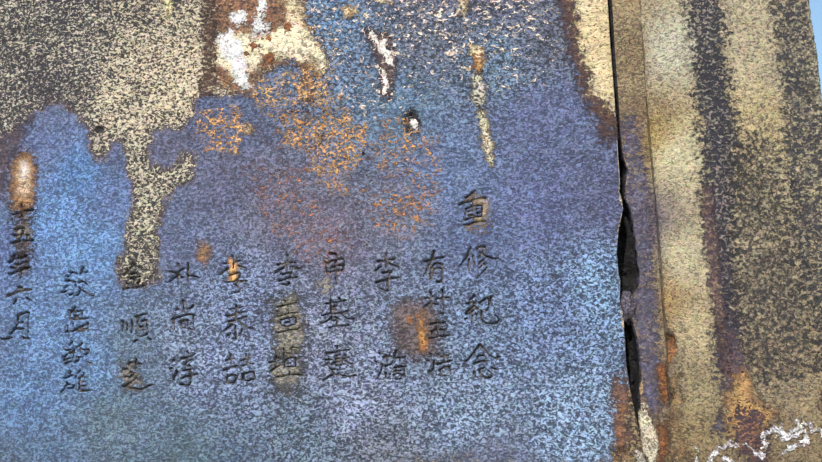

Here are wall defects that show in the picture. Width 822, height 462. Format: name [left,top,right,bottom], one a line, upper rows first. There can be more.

corrosion [0,115,35,201]
corrosion [188,0,442,265]
spalling [209,0,560,134]
corrosion [386,296,445,365]
crack [608,0,647,297]
crack [624,317,642,434]
corrosion [696,185,780,462]
damp [679,0,822,395]